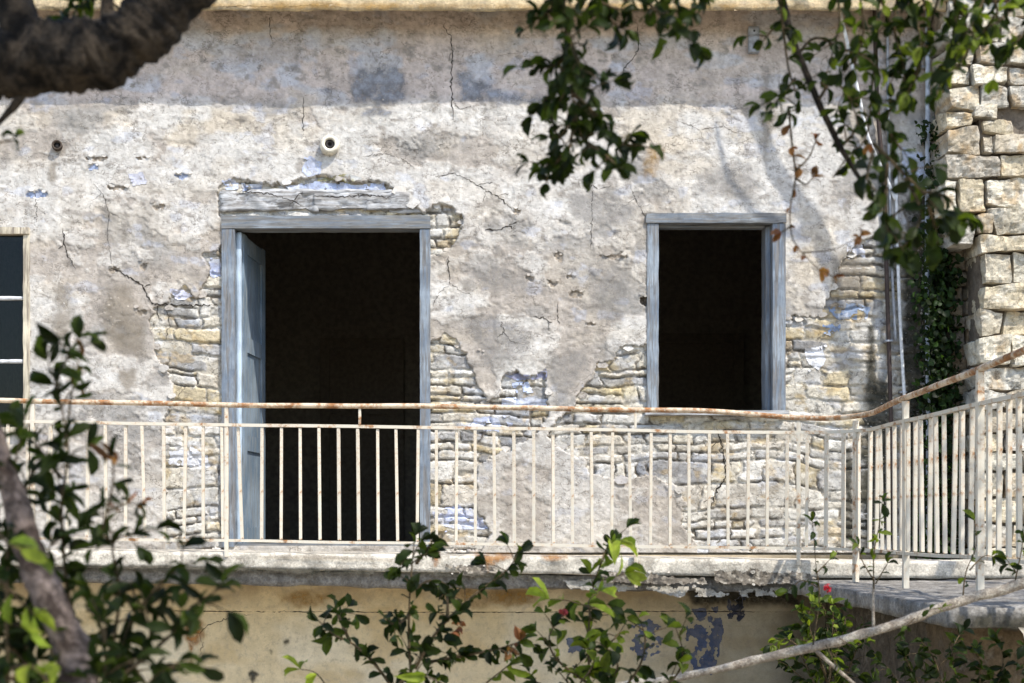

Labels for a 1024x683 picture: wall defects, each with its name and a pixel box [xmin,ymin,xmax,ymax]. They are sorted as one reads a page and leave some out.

damp [352,70,405,115]
crack [443,20,467,119]
damp [458,74,515,101]
crack [34,195,76,269]
crack [93,184,217,336]
spalling [217,156,463,256]
crack [435,173,516,231]
spalling [134,247,224,550]
spalling [430,232,920,577]
crack [704,427,731,506]
peeling [563,568,816,675]